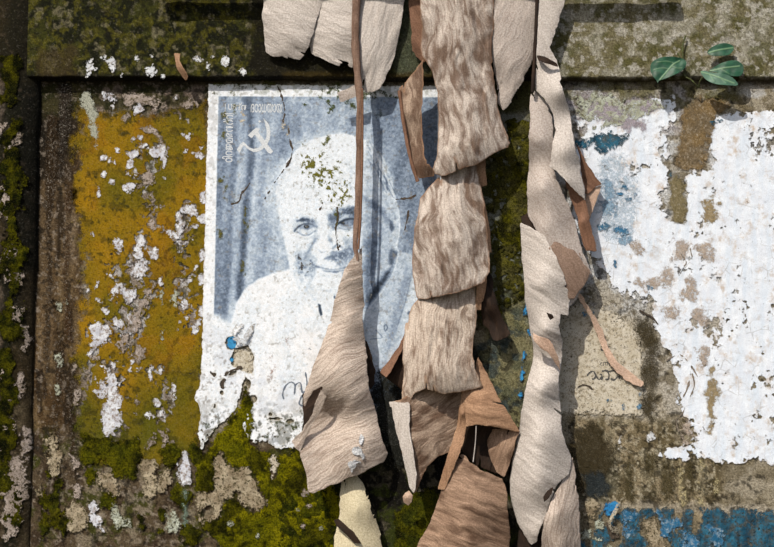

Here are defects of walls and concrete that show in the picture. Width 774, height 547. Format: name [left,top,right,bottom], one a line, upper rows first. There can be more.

flaking render [100,91,199,122]
peeling [100,125,206,253]
peeling [53,234,206,437]
peeling [572,90,774,466]
peeling [580,497,774,547]